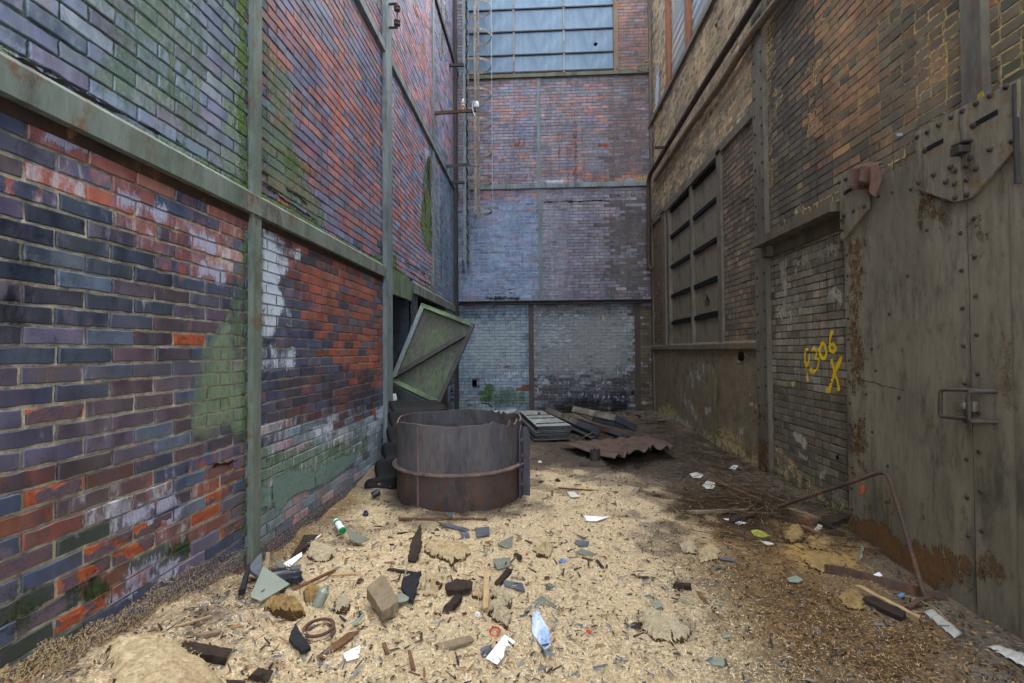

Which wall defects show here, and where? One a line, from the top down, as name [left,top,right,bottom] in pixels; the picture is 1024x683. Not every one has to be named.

leakage [261,229,303,372]
corrosion [845,234,868,396]
corrosion [847,414,1008,594]